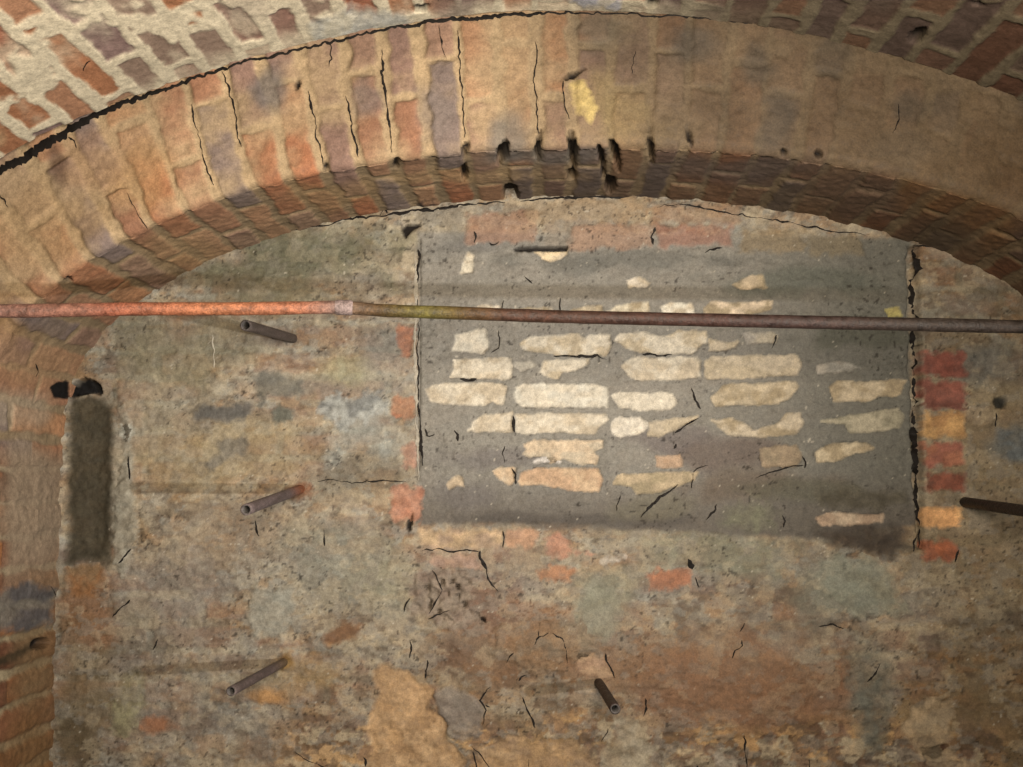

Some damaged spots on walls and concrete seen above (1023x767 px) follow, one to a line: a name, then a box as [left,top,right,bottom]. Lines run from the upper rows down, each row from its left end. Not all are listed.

crack [0,10,752,207]
flaking render [399,223,423,278]
spalling [512,245,570,263]
peeling [569,273,774,314]
spalling [49,377,103,400]
crack [318,250,459,484]
peeling [390,322,970,565]
crack [674,388,701,449]
crack [908,245,929,552]
crack [641,465,708,517]
crack [404,532,505,619]
spalling [364,661,660,767]